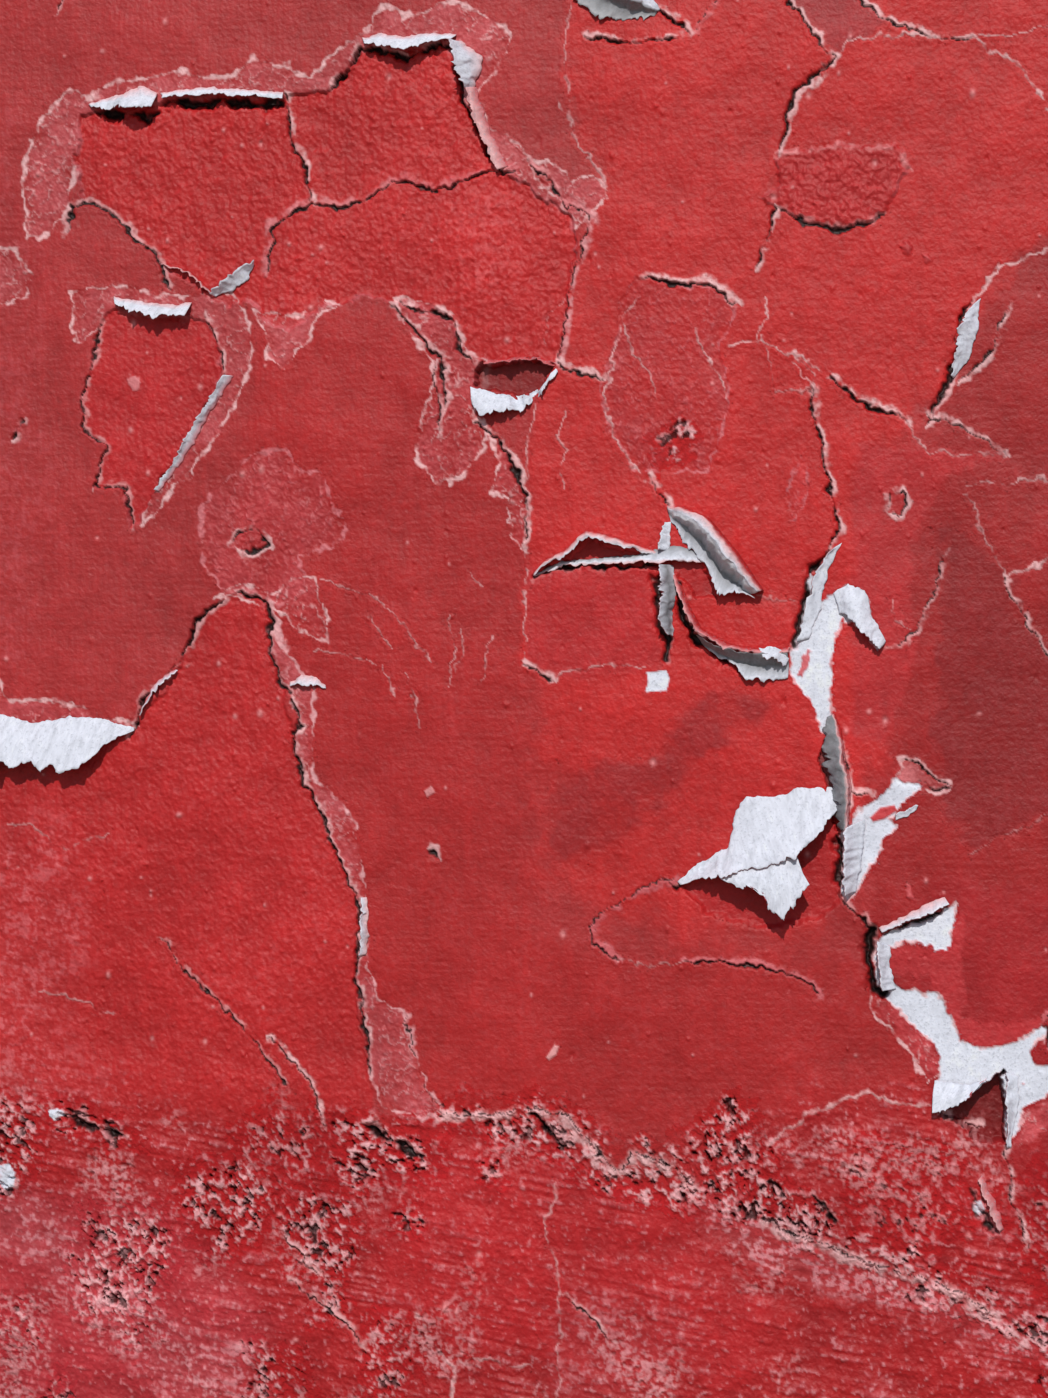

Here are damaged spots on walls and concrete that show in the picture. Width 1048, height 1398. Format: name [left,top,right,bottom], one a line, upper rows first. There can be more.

peeling [578,0,695,49]
crack [775,0,1048,159]
peeling [0,0,585,551]
crack [518,0,649,687]
crack [725,202,1048,663]
peeling [0,272,1048,1373]
crack [156,937,324,1106]
crack [614,955,825,1006]
crack [764,1087,935,1151]
spalling [228,1333,327,1398]
spalling [354,1302,438,1398]
spalling [1032,1374,1048,1398]